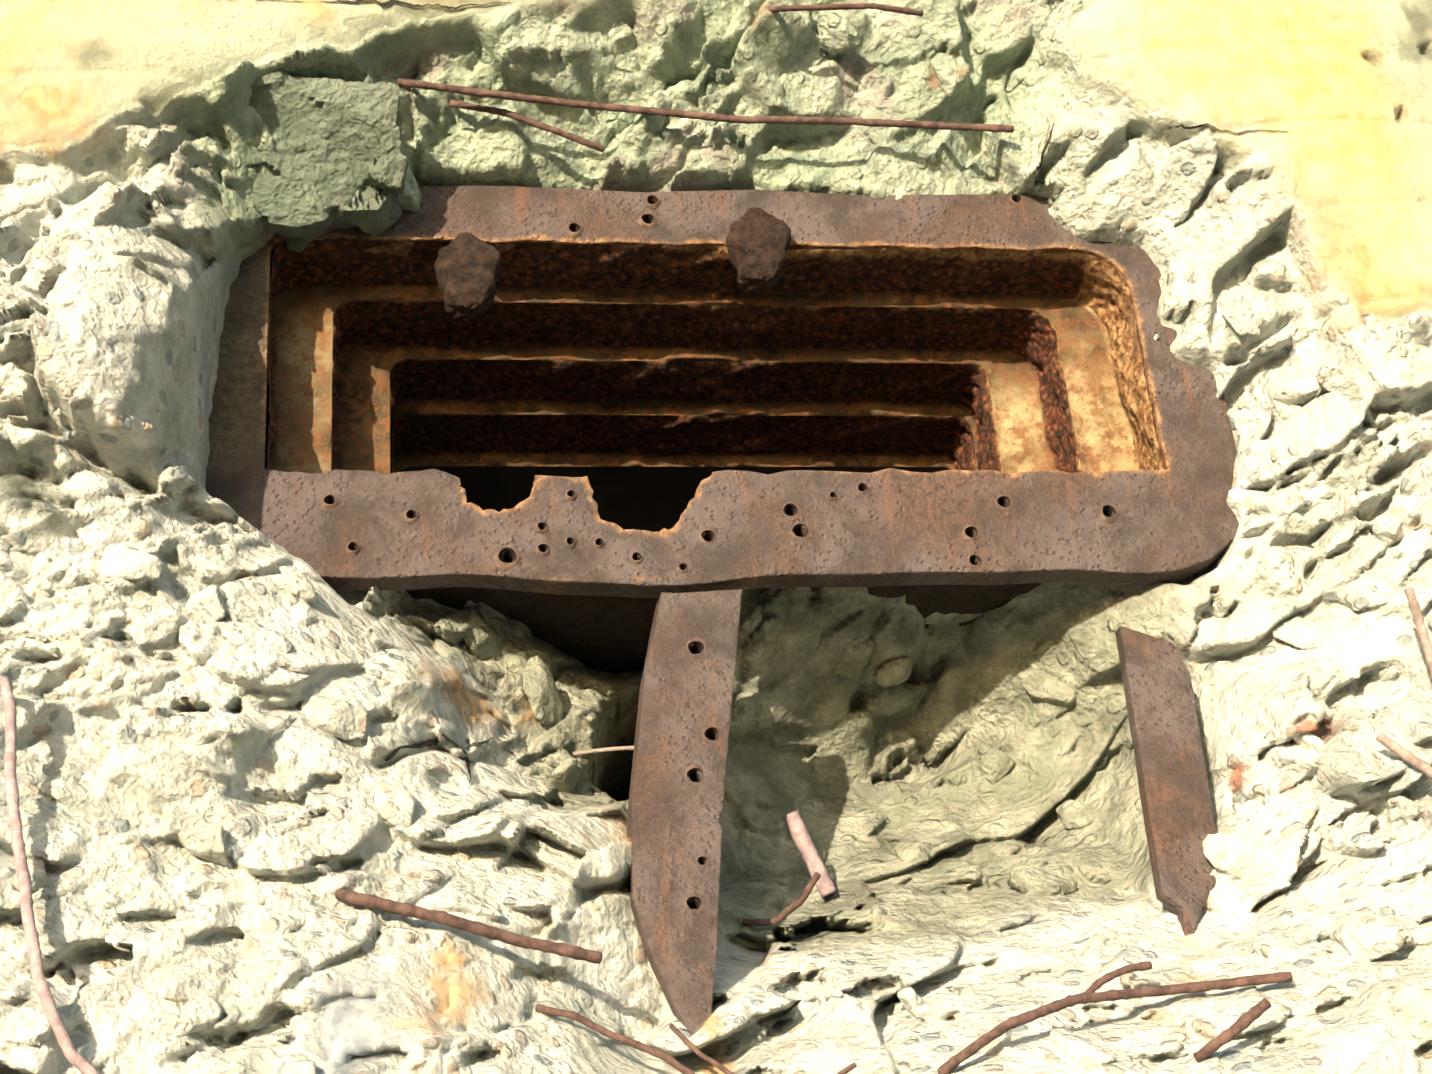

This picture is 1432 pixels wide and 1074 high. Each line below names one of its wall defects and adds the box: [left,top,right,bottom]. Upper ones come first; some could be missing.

rust [1144,0,1418,296]
spalling [212,0,1432,893]
spalling [95,544,163,582]
spalling [185,585,226,621]
spalling [718,574,1232,957]
spalling [0,688,87,1074]
spalling [428,889,503,921]
spalling [1329,921,1406,961]
spalling [826,993,863,1025]
spalling [1390,983,1432,1028]
rust [701,1059,730,1074]
spalling [1050,1026,1117,1067]